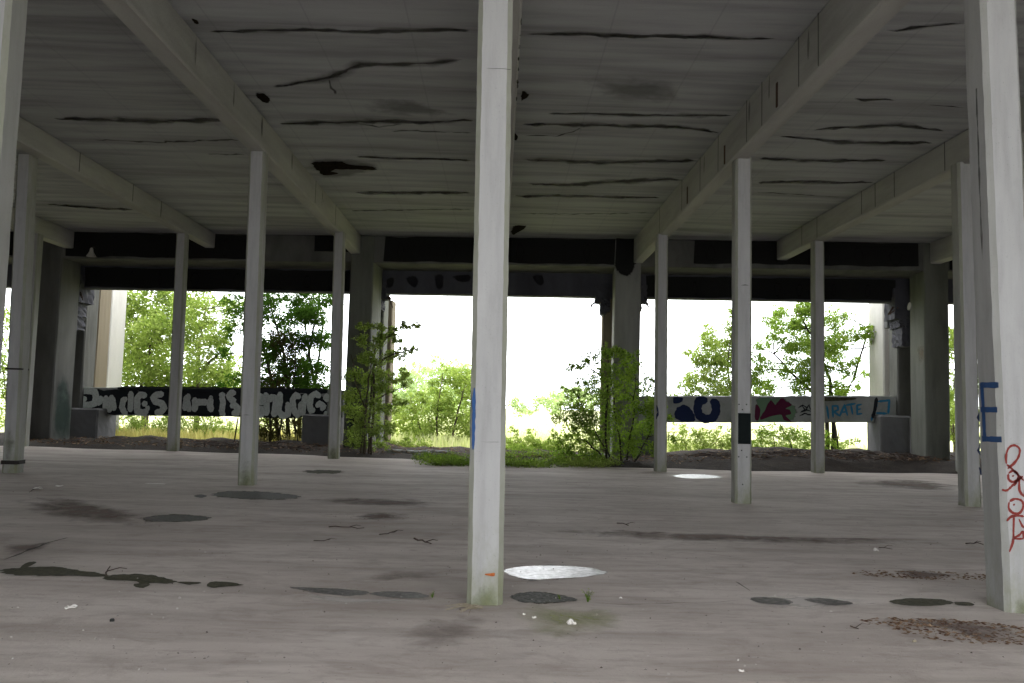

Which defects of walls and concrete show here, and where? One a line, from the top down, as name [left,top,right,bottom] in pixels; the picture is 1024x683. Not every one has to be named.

crack [213,26,466,34]
crack [532,32,772,40]
crack [276,59,461,93]
crack [818,98,962,131]
spalling [311,161,377,176]
damp [750,597,793,605]
damp [889,598,974,606]